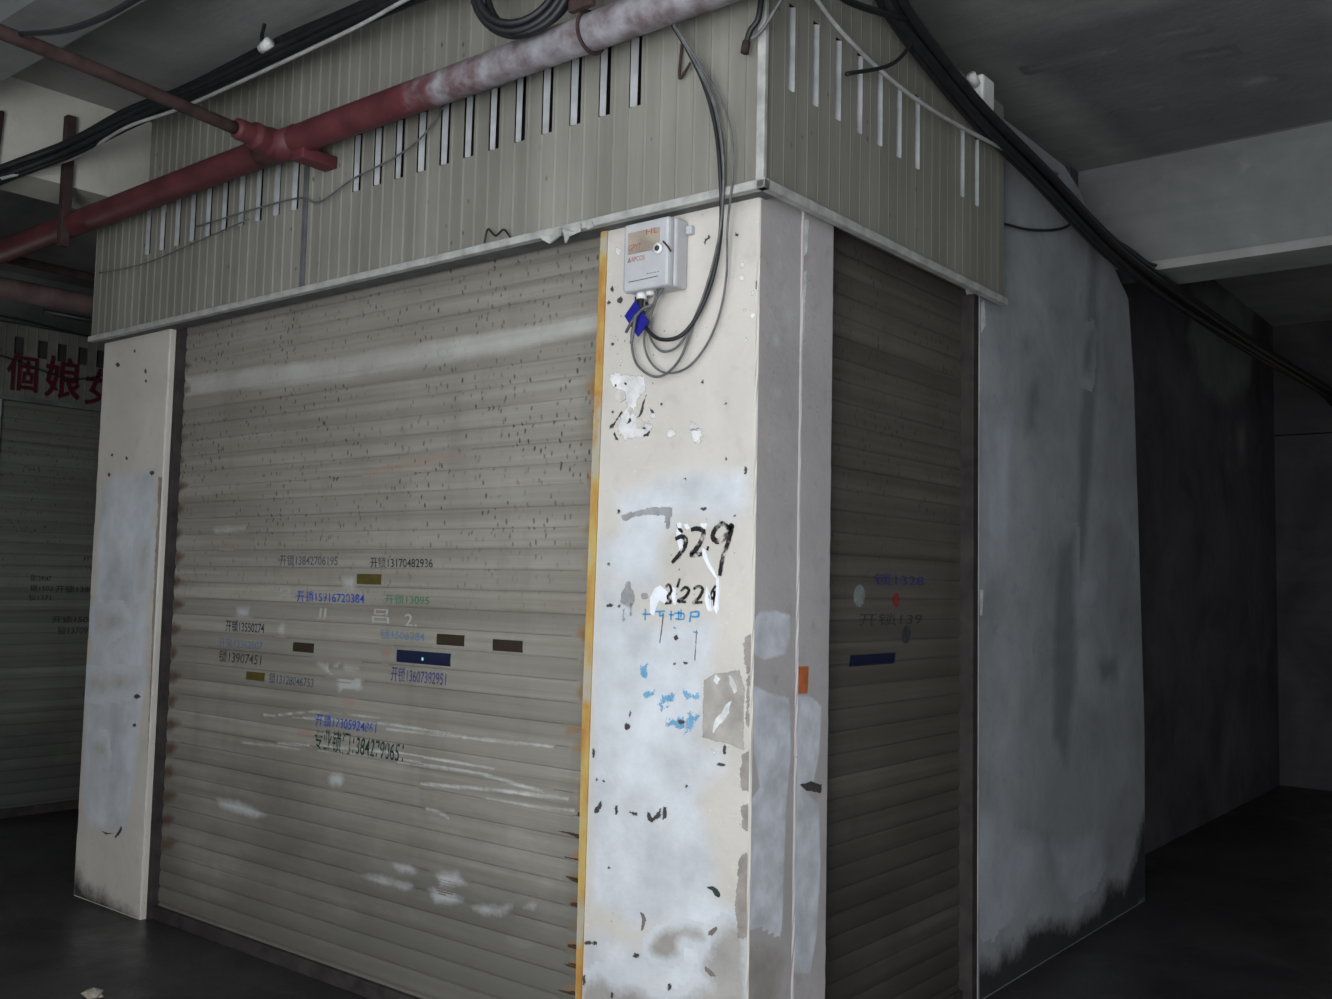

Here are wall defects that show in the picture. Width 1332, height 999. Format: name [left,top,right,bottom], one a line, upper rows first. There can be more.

spalling [609,360,703,443]
water stain [622,507,672,529]
water stain [620,581,648,621]
water stain [582,908,790,999]